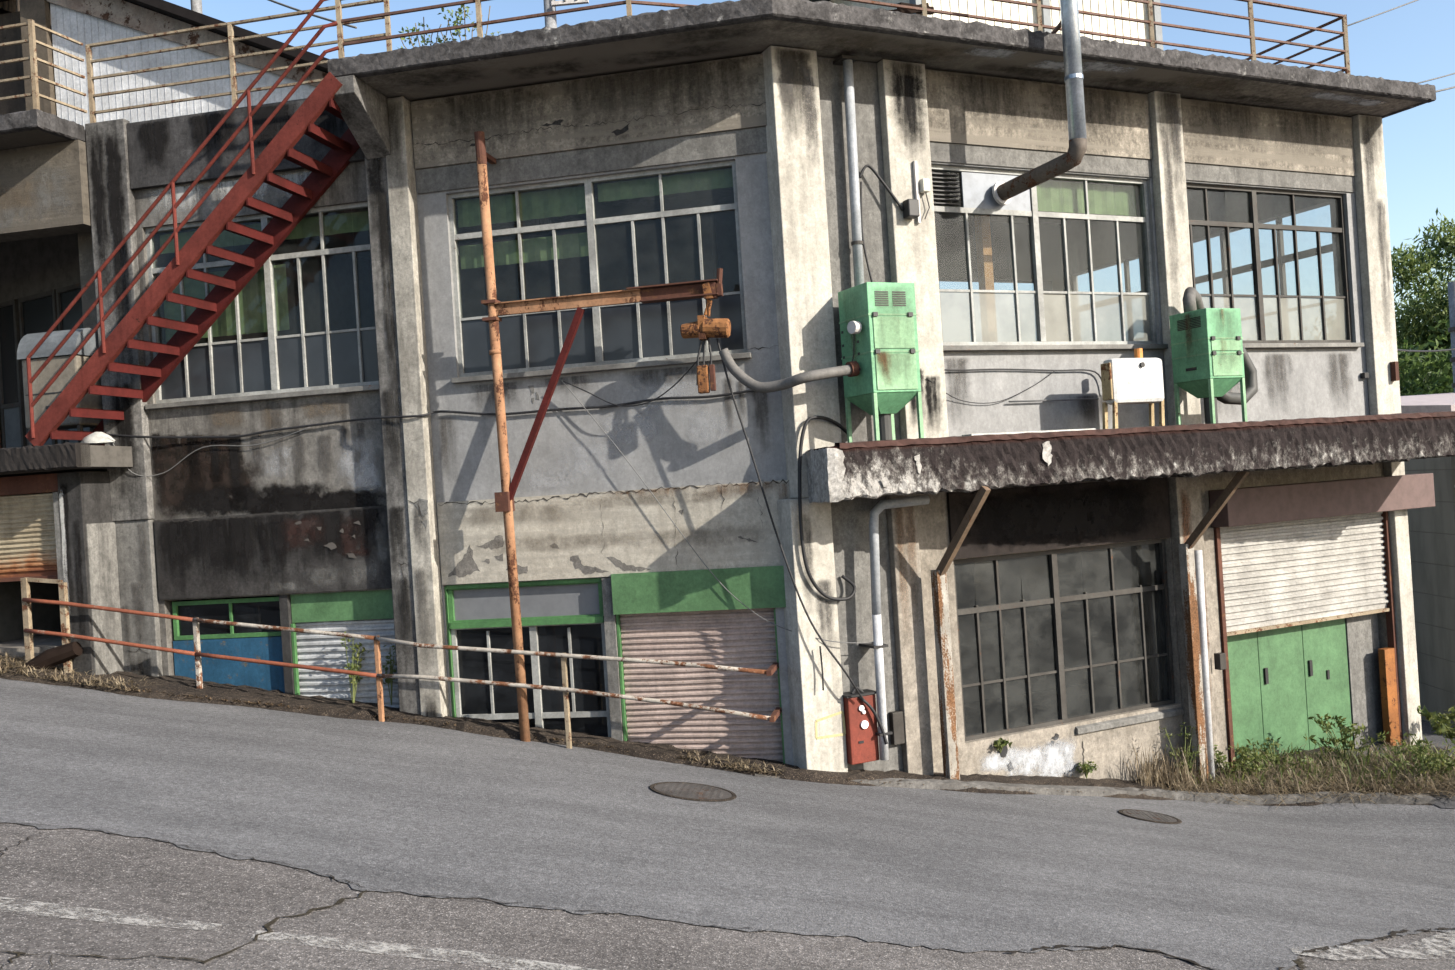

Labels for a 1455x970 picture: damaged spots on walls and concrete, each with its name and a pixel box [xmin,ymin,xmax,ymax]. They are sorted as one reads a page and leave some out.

leakage [828,36,947,138]
leakage [91,135,129,319]
leakage [911,359,966,423]
leakage [112,384,134,468]
leakage [139,410,421,582]
peeling [295,521,361,559]
peeling [448,535,528,577]
peeling [550,543,651,574]
leakage [982,741,1075,777]
crack [0,823,780,970]
crack [1008,944,1219,970]
crack [1278,927,1455,970]